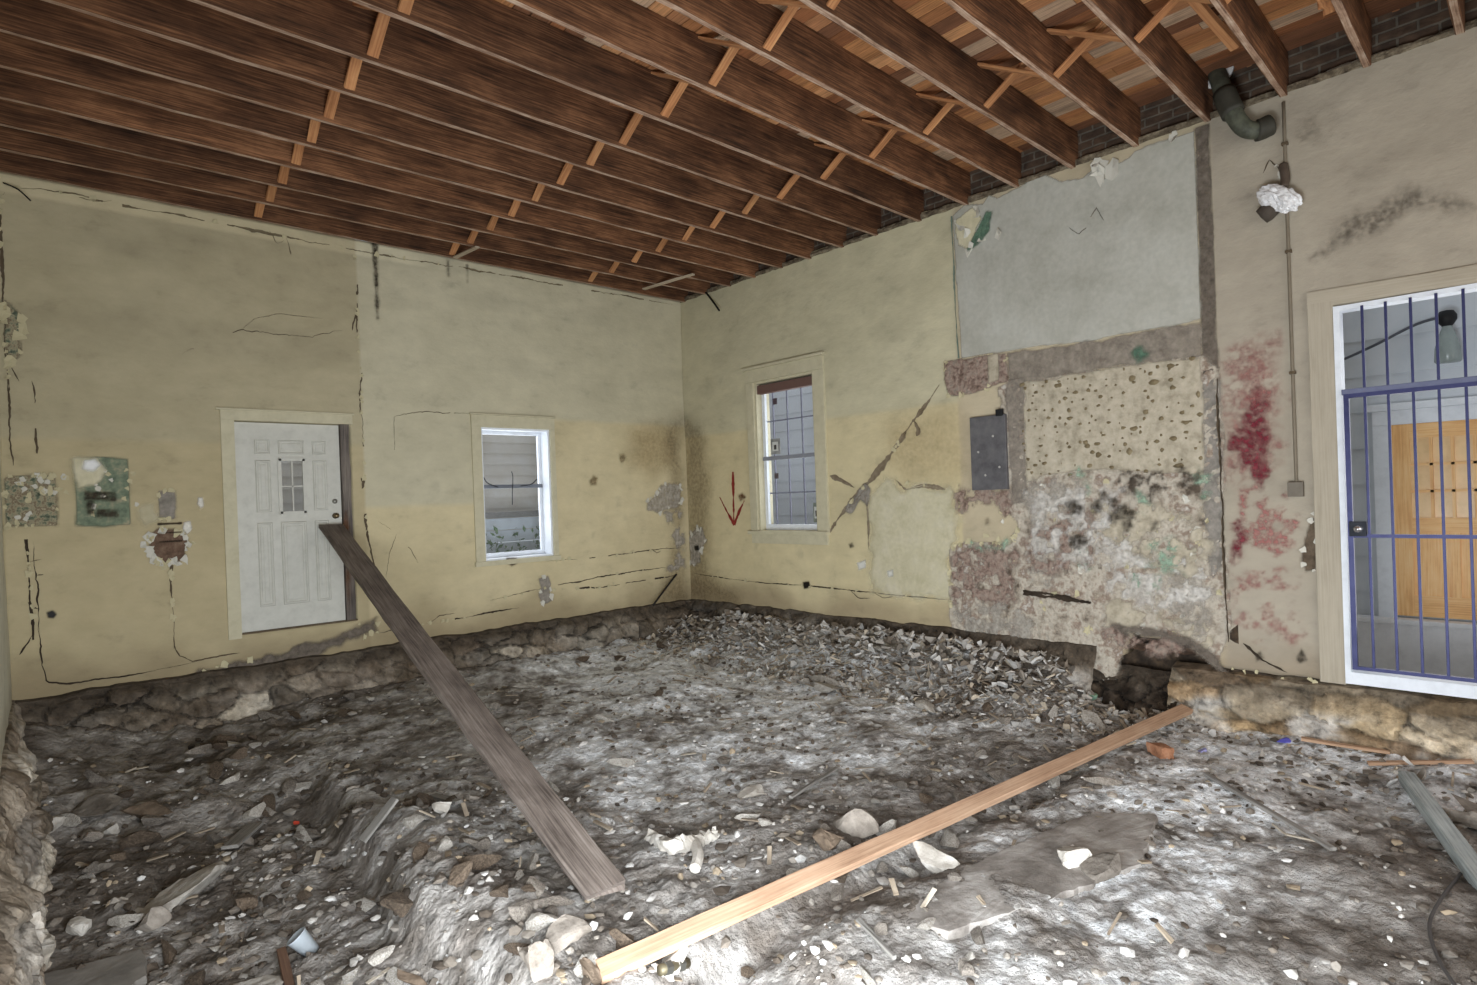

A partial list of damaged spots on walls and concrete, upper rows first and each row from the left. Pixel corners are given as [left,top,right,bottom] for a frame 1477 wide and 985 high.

peeling [0,300,29,368]
spalling [1,457,196,570]
crack [0,185,667,574]
peeling [645,482,707,571]
crack [830,385,945,547]
spalling [858,130,1240,681]
crack [20,539,238,685]